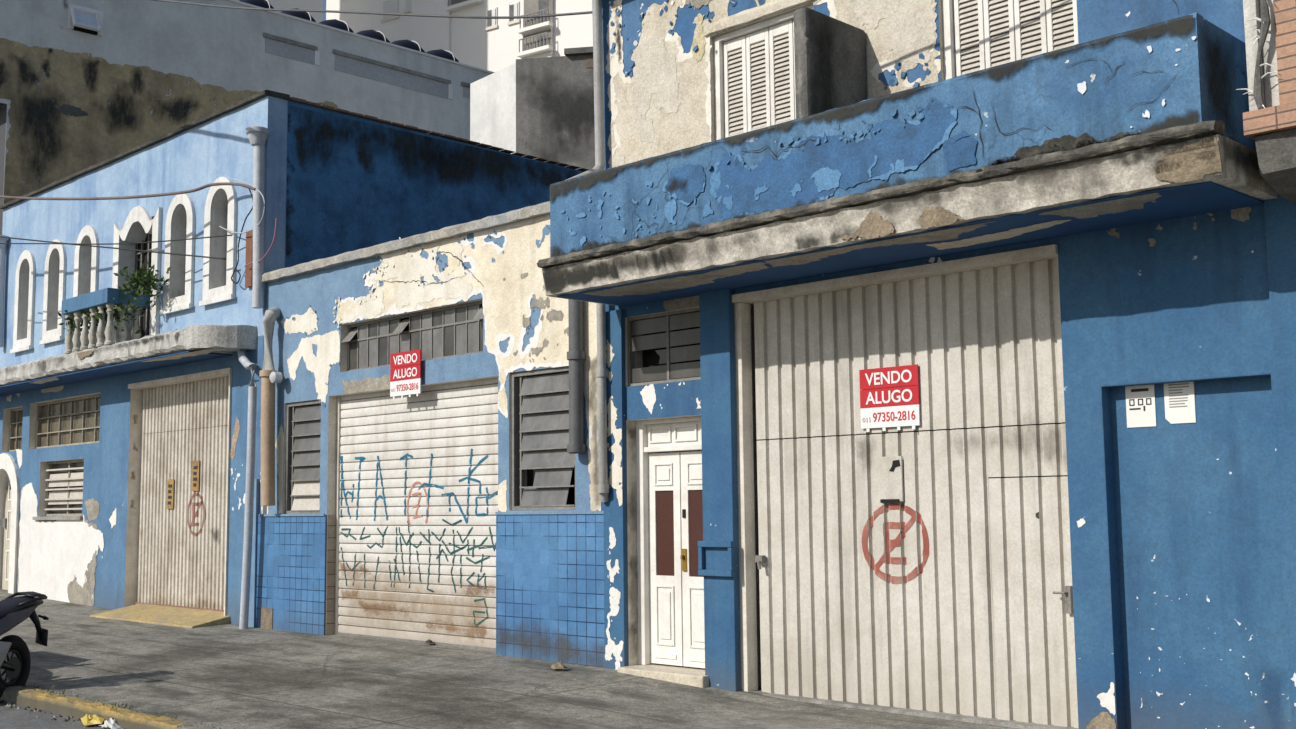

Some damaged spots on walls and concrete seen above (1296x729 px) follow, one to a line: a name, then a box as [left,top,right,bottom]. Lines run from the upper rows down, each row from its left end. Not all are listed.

water stain [0,38,259,204]
water stain [287,18,931,202]
crack [744,139,815,156]
crack [955,87,1051,153]
crack [1066,57,1174,113]
peeling [281,0,1222,512]
peeling [1231,207,1251,222]
peeling [17,483,116,606]
peeling [605,527,624,670]
spalling [1086,682,1116,729]